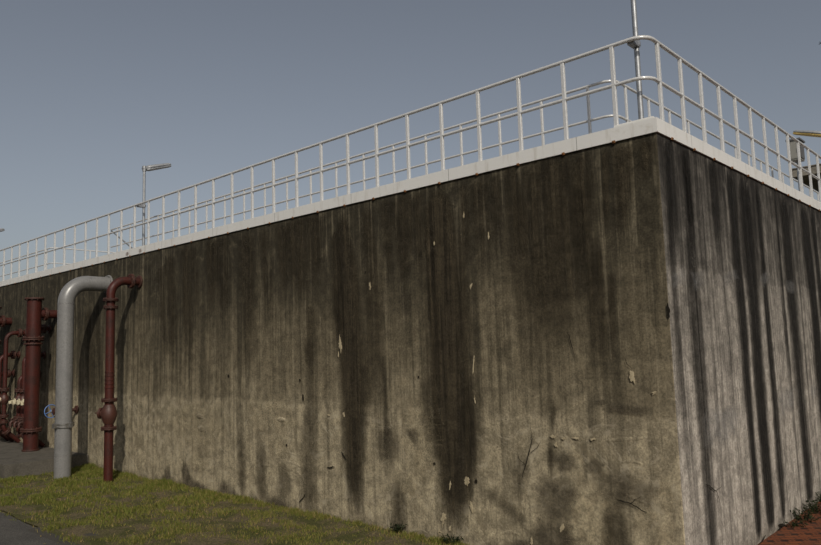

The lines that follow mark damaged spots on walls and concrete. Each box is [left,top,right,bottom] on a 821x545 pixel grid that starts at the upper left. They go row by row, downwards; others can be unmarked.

water stain [182,463,204,490]
water stain [332,220,368,505]
water stain [426,194,476,522]